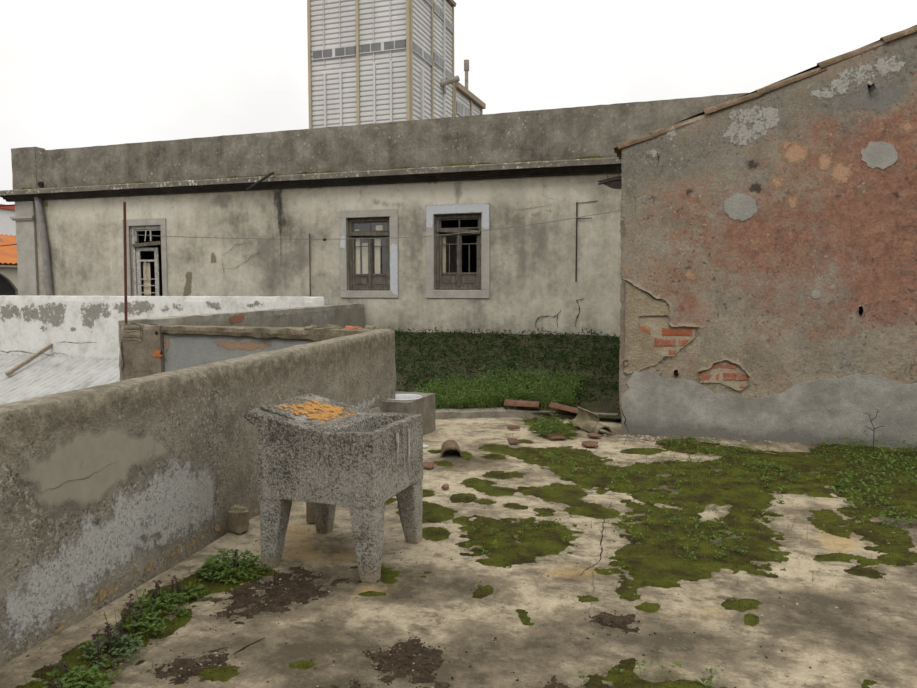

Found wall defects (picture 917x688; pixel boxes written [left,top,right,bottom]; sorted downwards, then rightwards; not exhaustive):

crack [222,192,281,271]
water stain [274,191,284,234]
peeling [0,302,66,332]
peeling [70,300,183,341]
spalling [620,281,699,373]
flaking render [698,360,749,390]
crack [582,502,612,614]